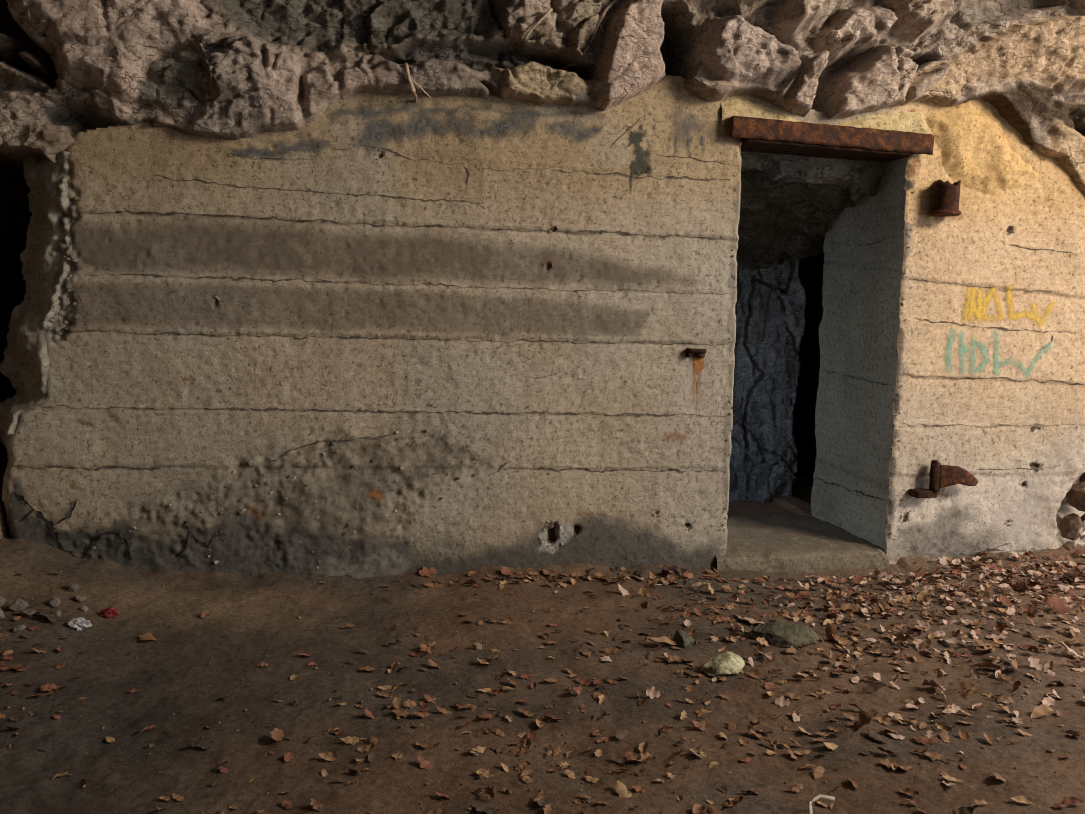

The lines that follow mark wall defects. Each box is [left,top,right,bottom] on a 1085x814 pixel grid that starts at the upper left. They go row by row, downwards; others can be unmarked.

water stain [7,479,715,579]
spalling [538,520,581,554]